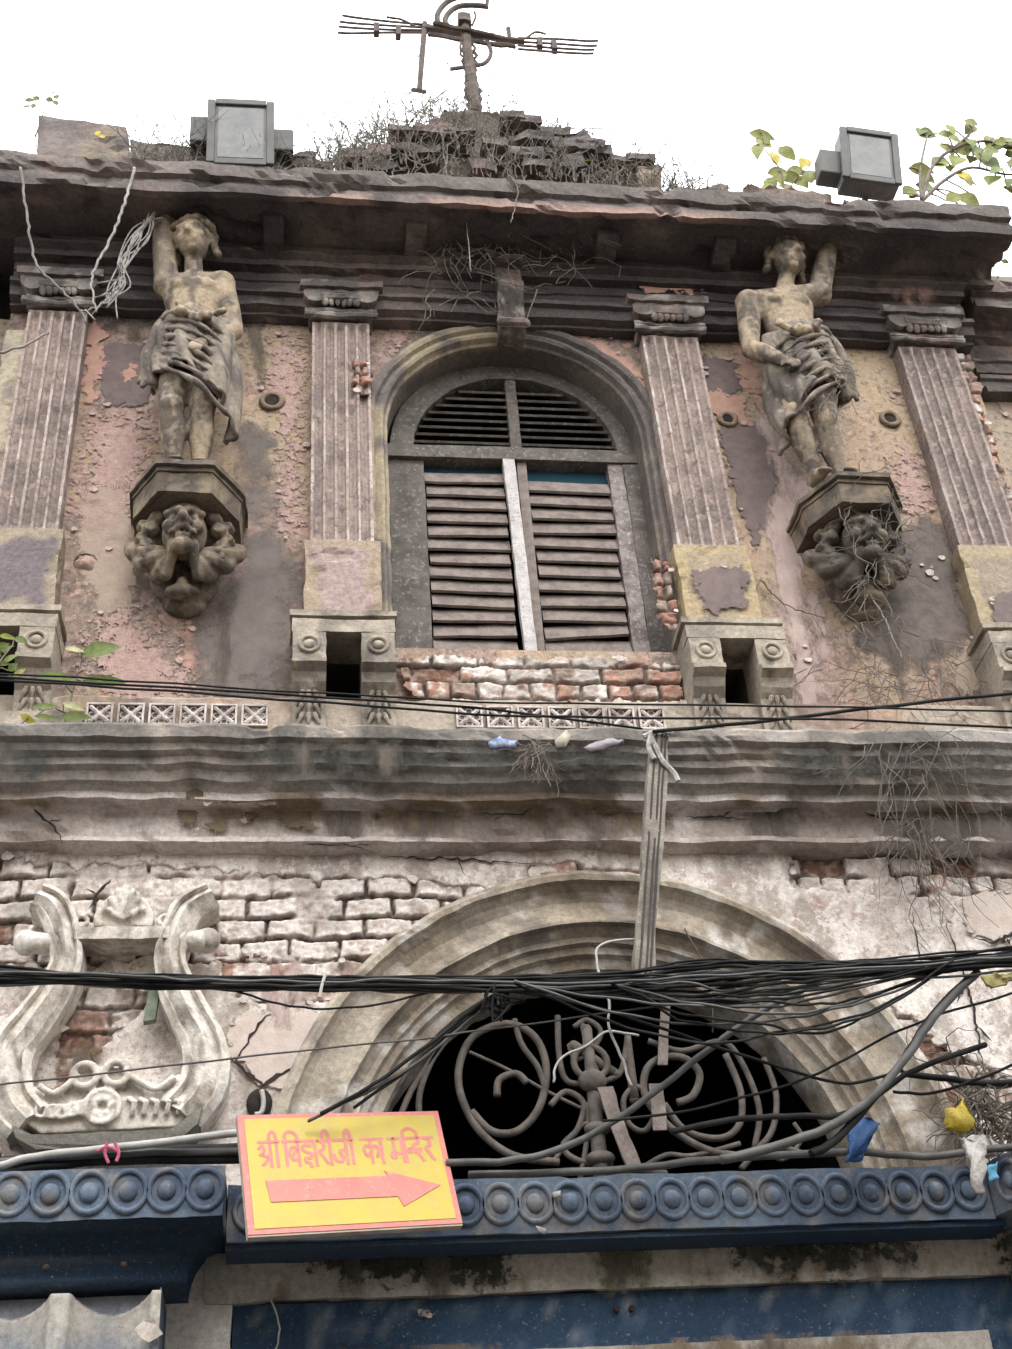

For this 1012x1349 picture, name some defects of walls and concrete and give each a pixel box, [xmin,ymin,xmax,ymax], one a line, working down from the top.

peeling [702,342,778,550]
peeling [65,321,202,699]
spalling [396,654,687,704]
water stain [379,747,397,772]
crack [33,809,63,842]
spalling [0,851,484,976]
spalling [788,851,1012,941]
spalling [56,987,148,1087]
peeling [226,991,336,1089]
crack [912,913,1012,1068]
water stain [728,1241,930,1288]
water stain [985,1229,1012,1282]